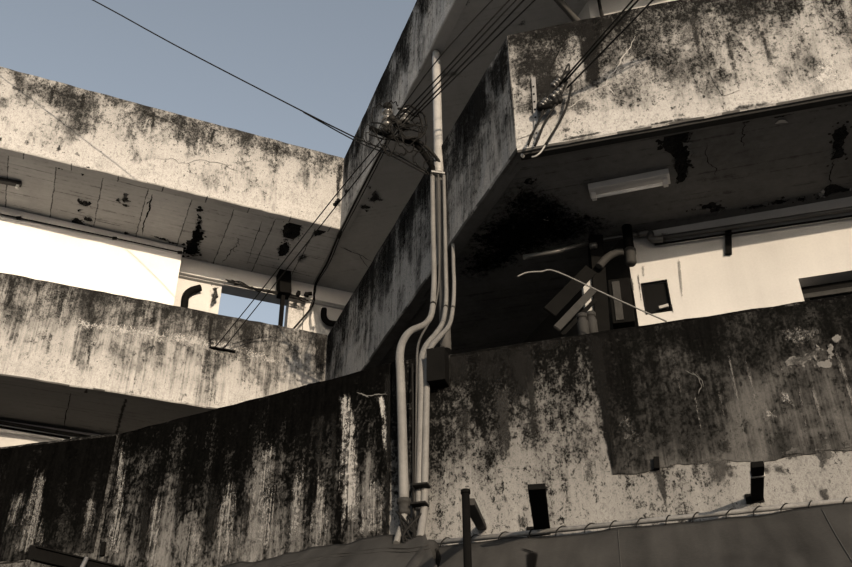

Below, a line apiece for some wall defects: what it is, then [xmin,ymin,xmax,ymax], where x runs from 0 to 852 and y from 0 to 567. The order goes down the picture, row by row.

leakage [458,21,605,143]
leakage [140,110,215,143]
leakage [253,139,346,206]
spalling [655,132,694,184]
spalling [827,121,852,167]
peeling [71,198,94,227]
crack [142,195,152,235]
spalling [154,206,206,258]
leakage [449,334,633,467]
leakage [184,374,391,565]
leakage [8,476,44,552]
leakage [106,452,125,561]